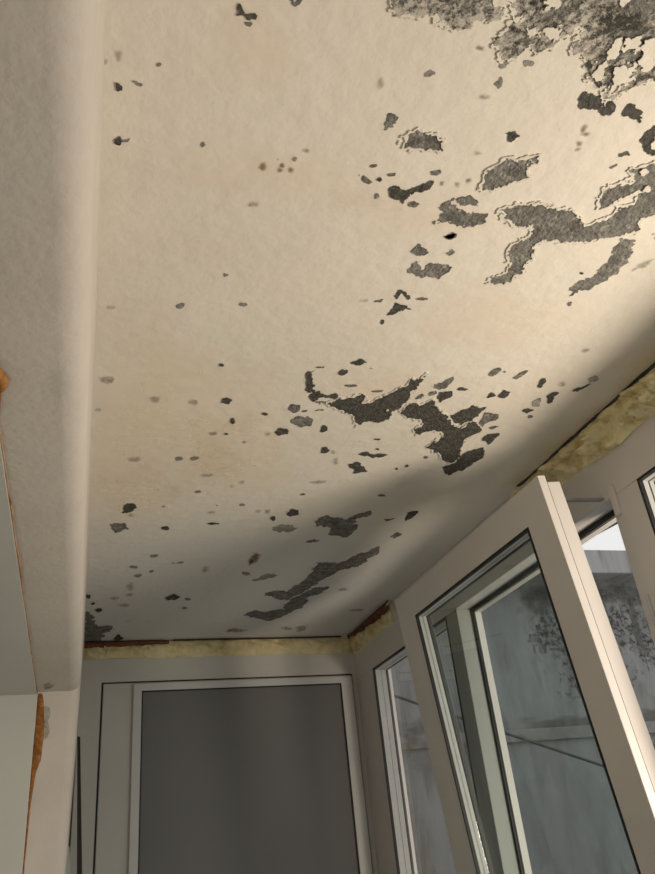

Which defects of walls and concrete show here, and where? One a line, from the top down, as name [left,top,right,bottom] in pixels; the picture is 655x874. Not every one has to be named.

peeling [236,4,257,27]
peeling [384,113,398,131]
peeling [388,0,655,306]
peeling [359,164,443,208]
peeling [488,368,528,379]
peeling [268,359,510,476]
peeling [523,375,599,418]
peeling [267,509,299,533]
peeling [315,511,372,538]
peeling [242,546,382,631]